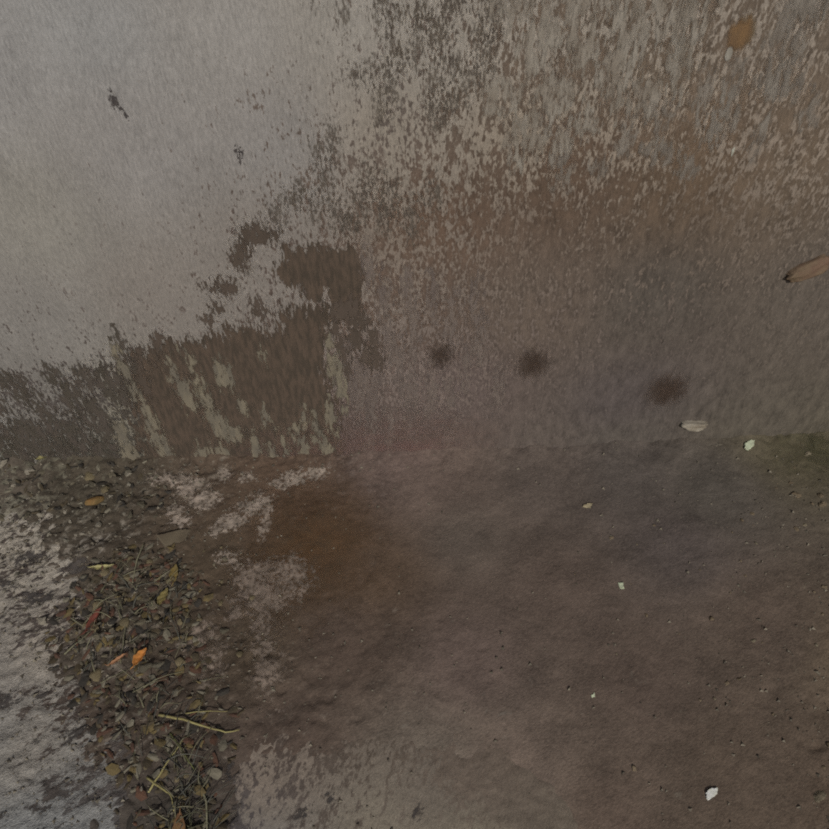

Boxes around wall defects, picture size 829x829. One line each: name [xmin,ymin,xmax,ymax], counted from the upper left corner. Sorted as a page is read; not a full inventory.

leakage [114,216,389,701]